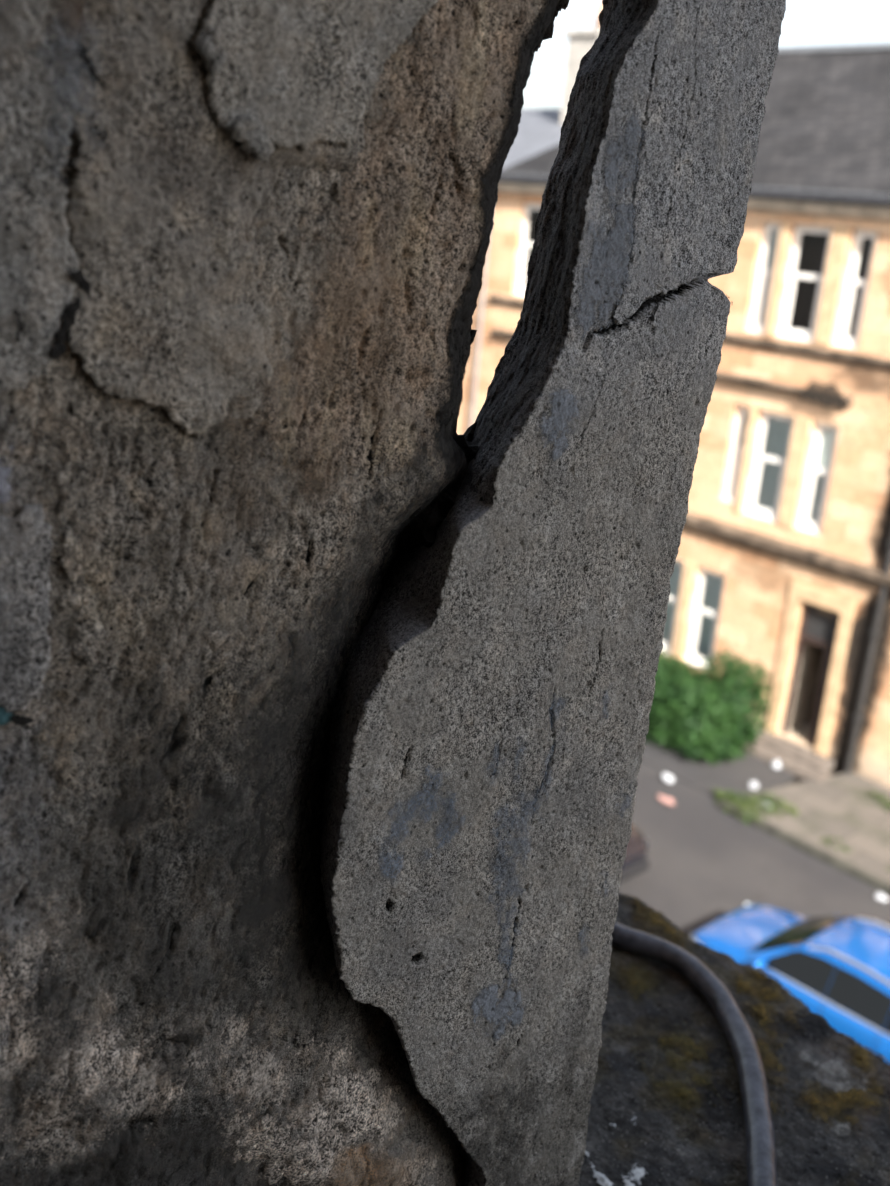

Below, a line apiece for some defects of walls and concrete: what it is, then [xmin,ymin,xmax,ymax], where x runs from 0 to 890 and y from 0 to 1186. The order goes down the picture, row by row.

crack [593,285,692,335]
peeling [0,0,537,830]
crack [367,416,379,476]
leakage [869,483,890,571]
crack [531,689,555,824]
crack [503,899,520,979]